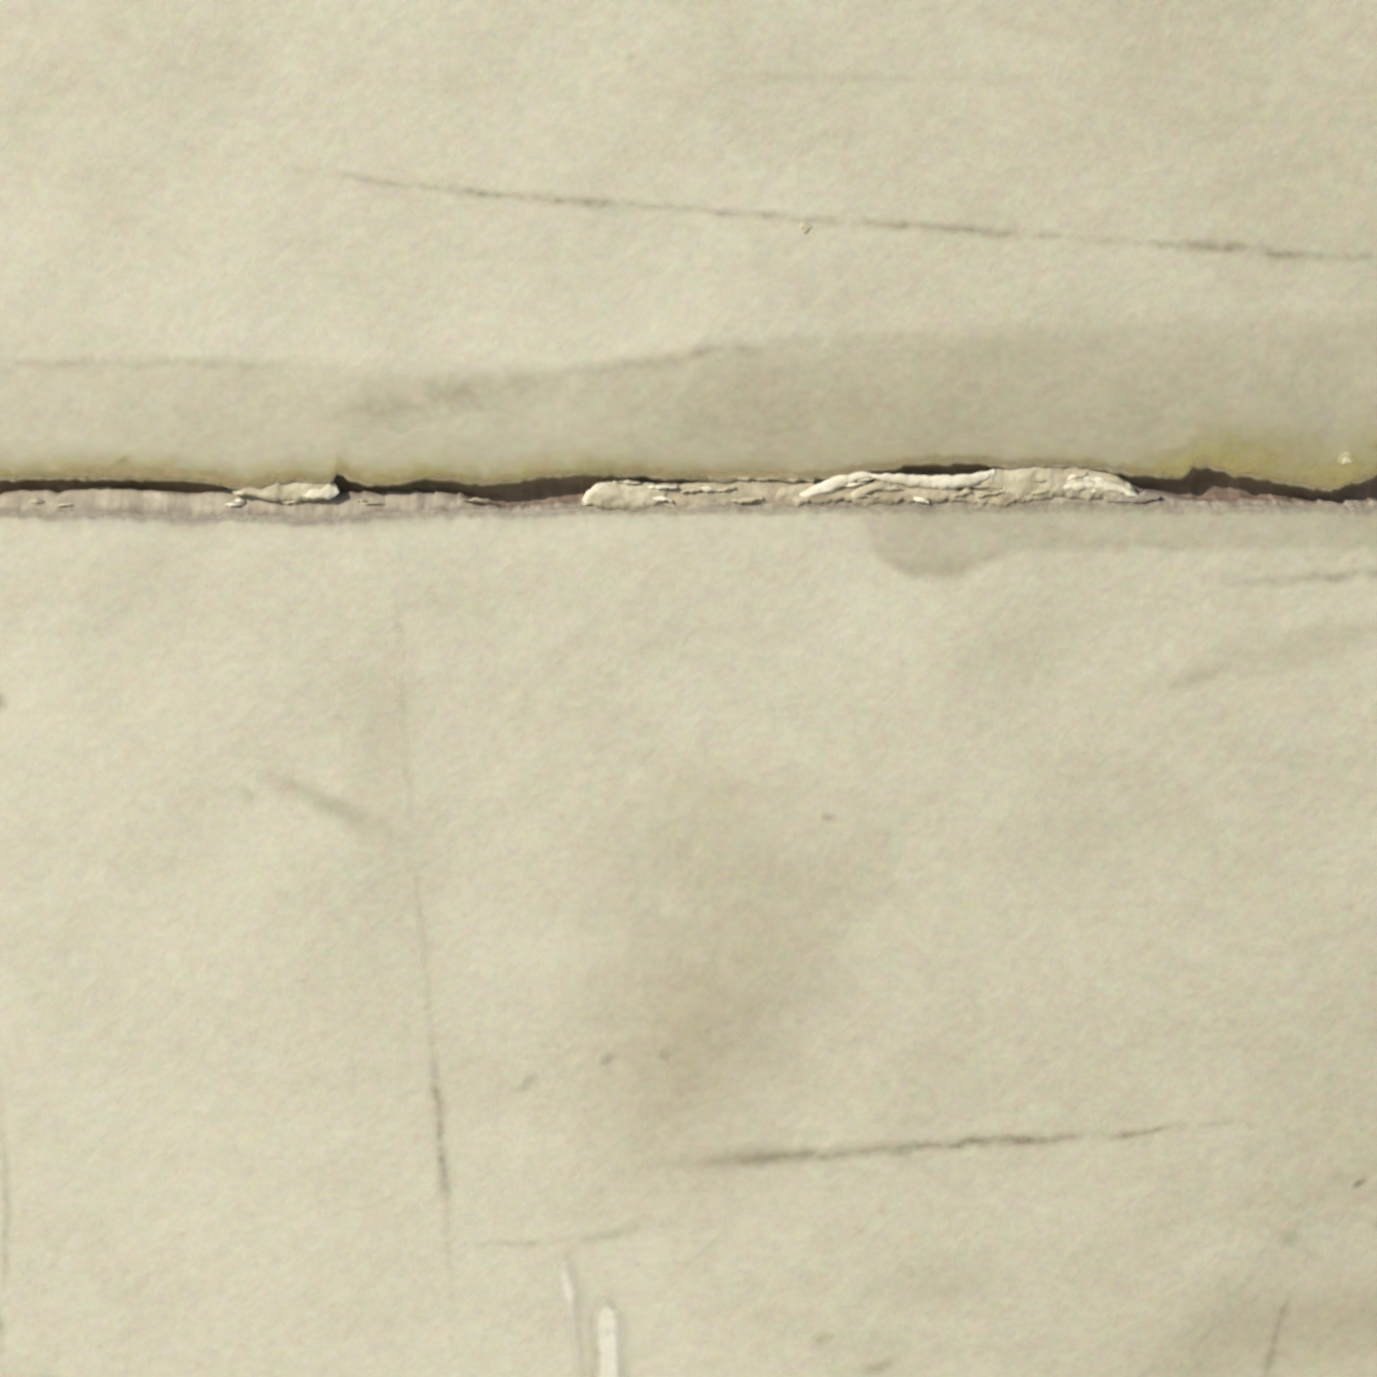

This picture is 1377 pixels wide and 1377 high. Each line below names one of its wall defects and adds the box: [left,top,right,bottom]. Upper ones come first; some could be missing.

peeling [233,482,339,502]
crack [0,456,1377,523]
peeling [582,467,1160,512]